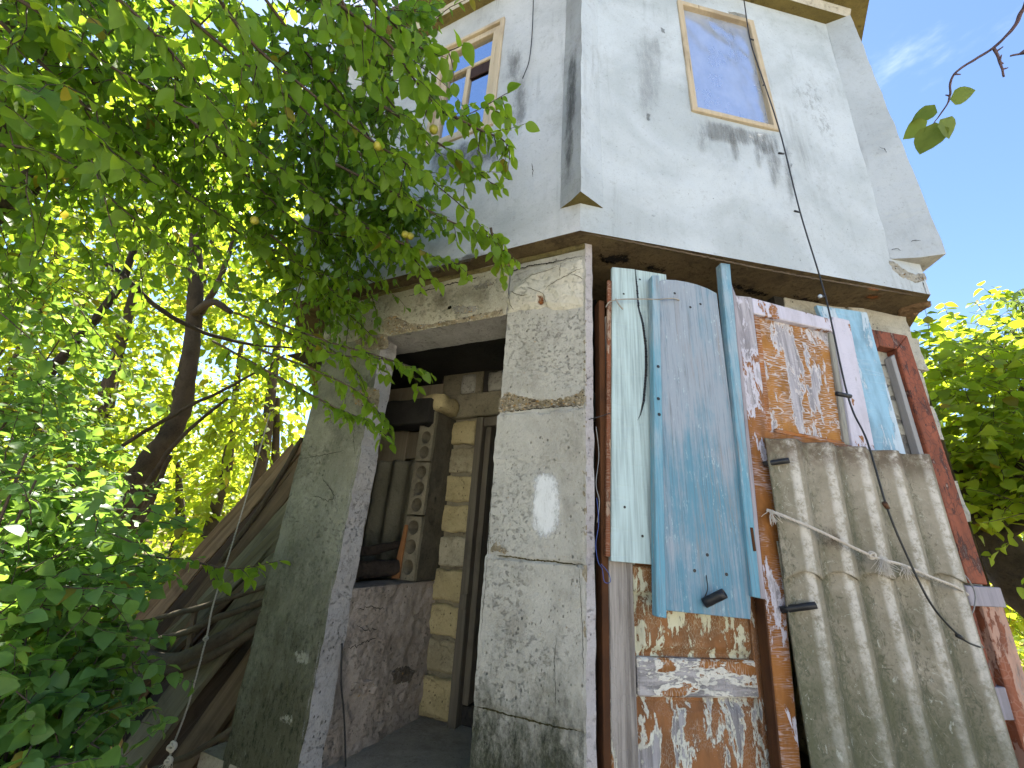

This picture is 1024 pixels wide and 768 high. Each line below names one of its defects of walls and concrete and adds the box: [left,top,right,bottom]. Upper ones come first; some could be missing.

damp [566,61,575,164]
crack [509,256,582,310]
spalling [589,234,932,319]